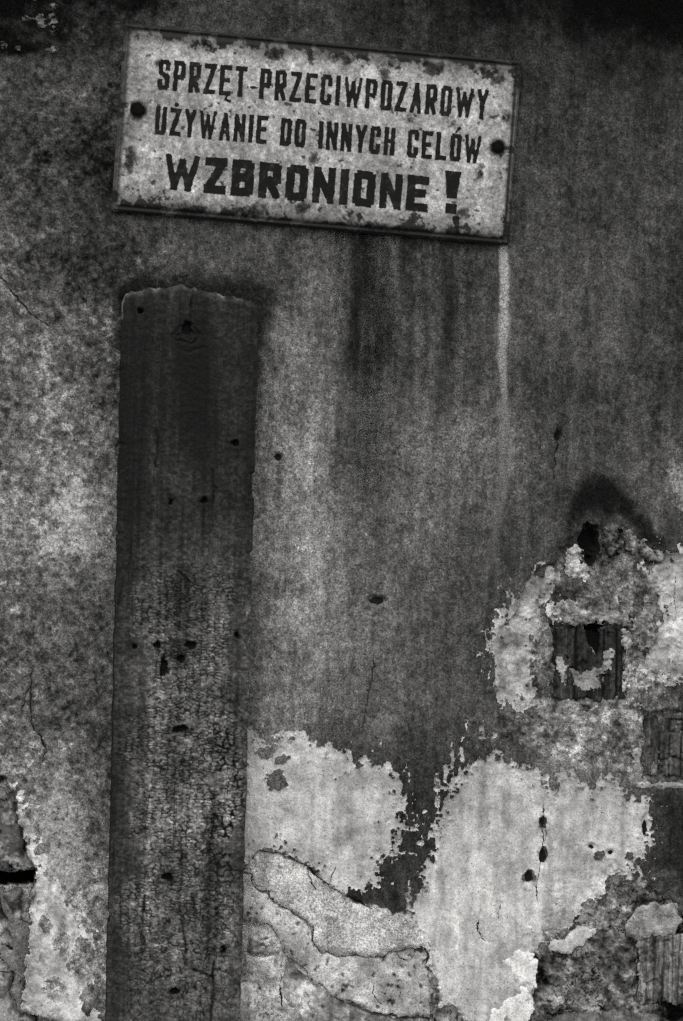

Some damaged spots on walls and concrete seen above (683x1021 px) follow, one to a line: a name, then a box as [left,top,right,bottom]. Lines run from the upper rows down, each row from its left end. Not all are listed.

water stain [348,233,371,367]
water stain [498,246,509,417]
spalling [476,521,683,722]
peeling [0,743,104,1021]
peeling [244,718,683,1021]